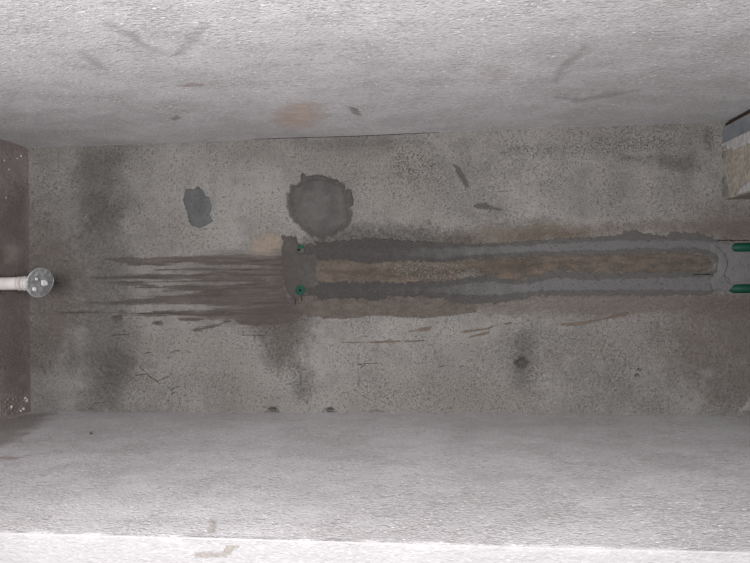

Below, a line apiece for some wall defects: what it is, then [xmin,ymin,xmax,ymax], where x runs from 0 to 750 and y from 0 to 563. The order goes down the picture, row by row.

rust [315,251,713,285]
leakage [90,255,308,366]
rust [297,295,750,326]
rust [370,327,431,343]
crack [135,350,179,395]